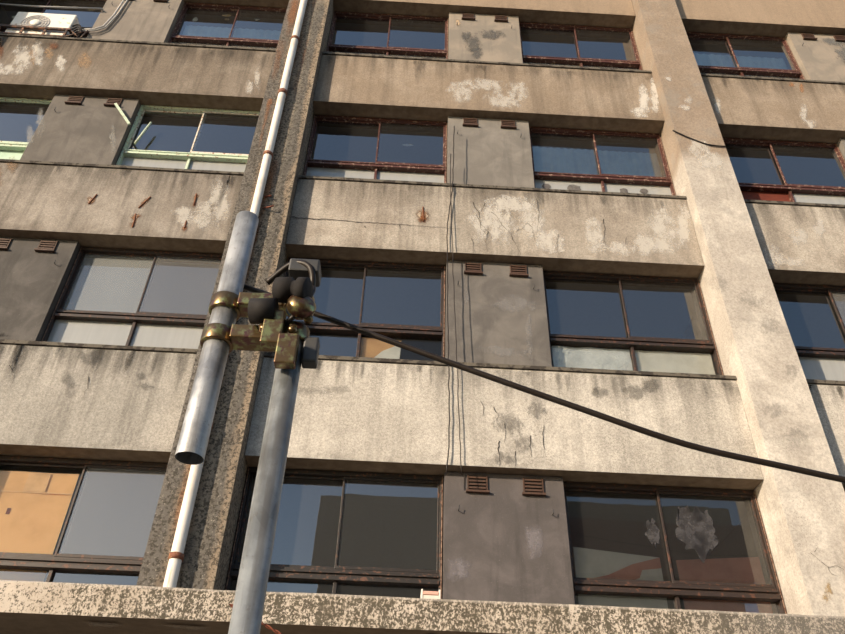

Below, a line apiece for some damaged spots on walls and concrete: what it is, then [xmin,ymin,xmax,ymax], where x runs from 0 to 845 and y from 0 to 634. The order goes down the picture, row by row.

water stain [0,45,43,74]
water stain [462,30,502,59]
water stain [632,80,659,117]
water stain [690,141,721,167]
crack [292,199,539,254]
water stain [586,218,628,255]
water stain [635,206,690,253]